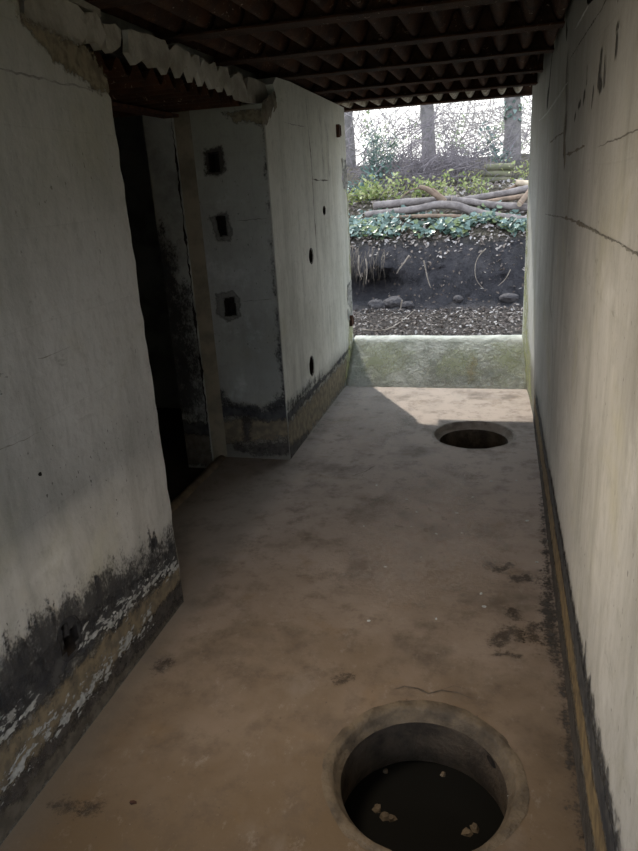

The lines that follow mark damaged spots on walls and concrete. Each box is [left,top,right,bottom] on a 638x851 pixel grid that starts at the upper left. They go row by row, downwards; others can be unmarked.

spalling [21,18,110,95]
spalling [222,91,277,126]
crack [550,129,638,156]
crack [546,214,638,256]
damp [220,326,353,458]
damp [490,395,621,851]
damp [0,526,184,813]